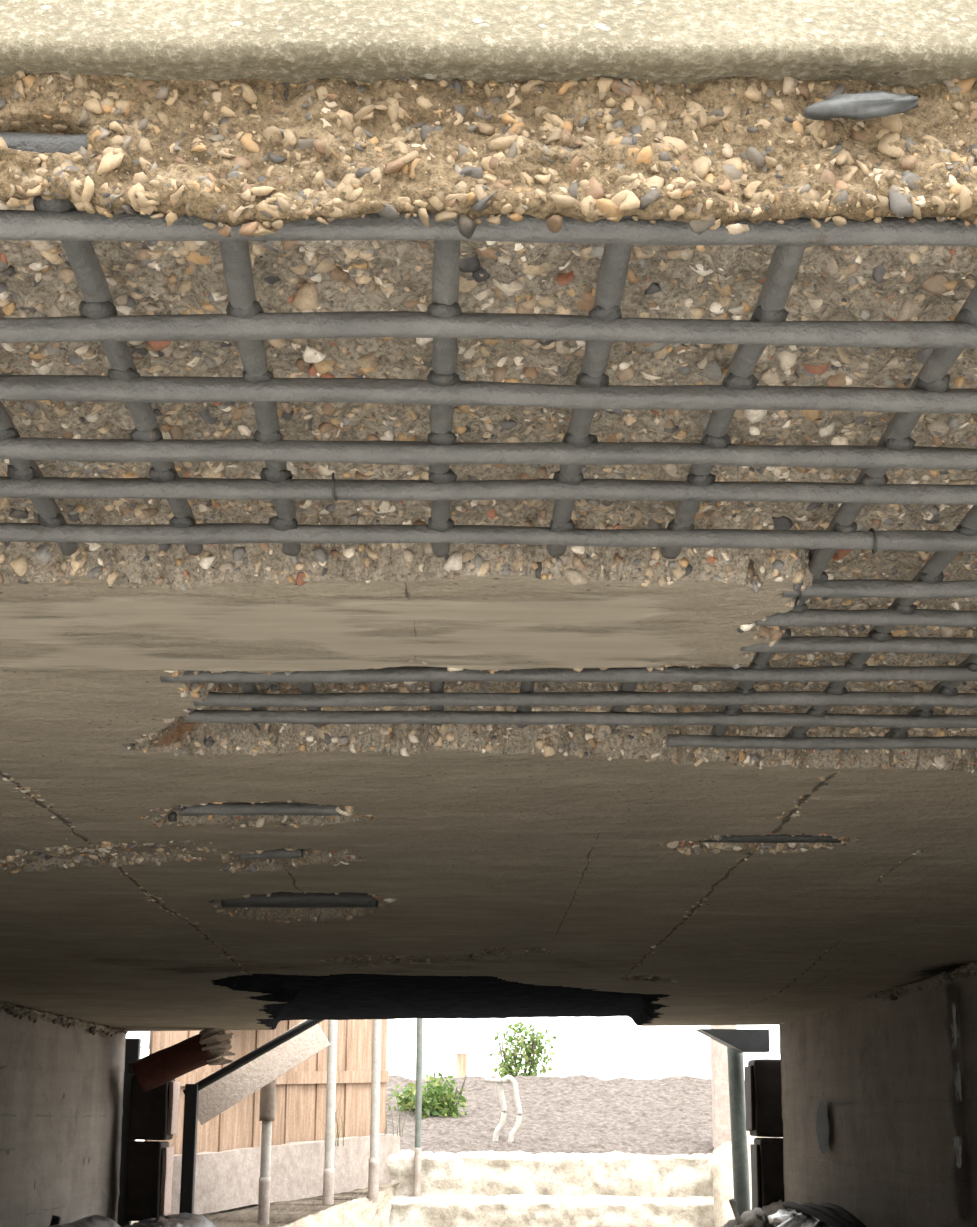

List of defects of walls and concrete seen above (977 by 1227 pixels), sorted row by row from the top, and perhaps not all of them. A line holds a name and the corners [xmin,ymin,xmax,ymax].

spalling [0,70,977,321]
spalling [0,341,111,376]
spalling [263,337,433,380]
spalling [455,338,586,385]
spalling [605,342,738,386]
spalling [752,345,935,388]
spalling [727,409,896,445]
spalling [0,542,977,777]
crack [0,767,91,845]
crack [621,769,841,980]
crack [117,865,252,975]
spalling [211,974,670,1030]